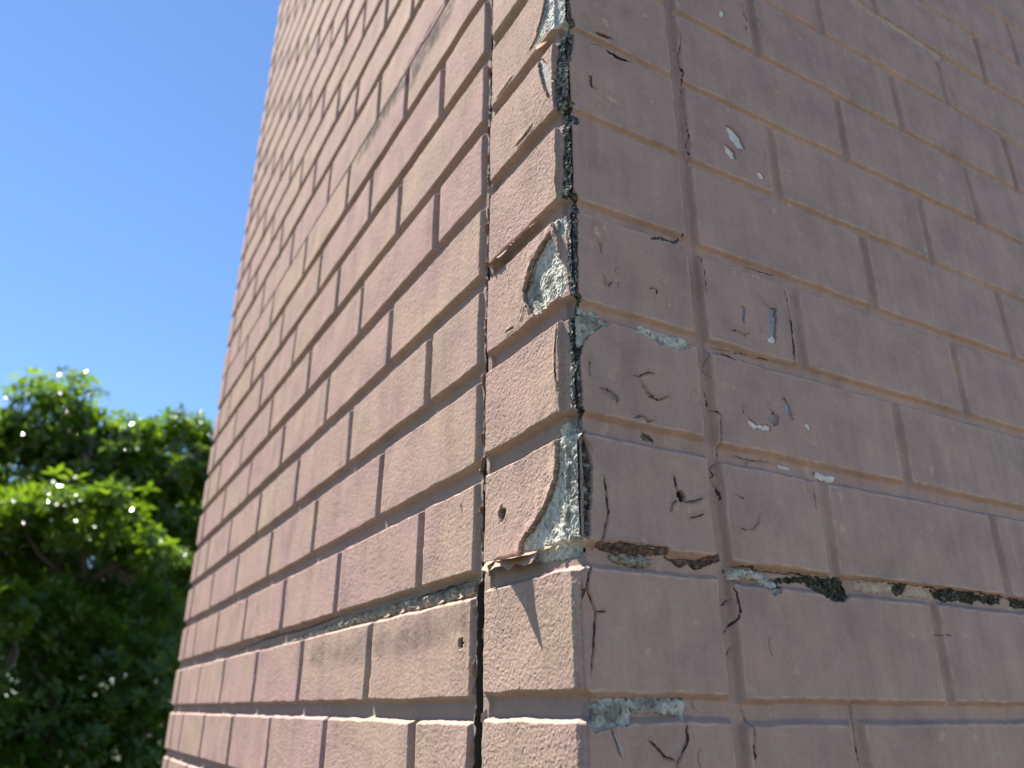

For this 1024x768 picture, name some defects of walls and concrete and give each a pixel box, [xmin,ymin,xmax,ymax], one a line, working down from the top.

peeling [725,127,743,160]
spalling [472,0,611,616]
crack [552,337,560,386]
spalling [634,326,689,350]
crack [633,372,667,442]
spalling [608,555,651,569]
spalling [722,569,781,594]
crack [581,475,1015,671]
peeling [853,580,933,601]
spalling [589,697,688,759]
crack [649,700,693,762]